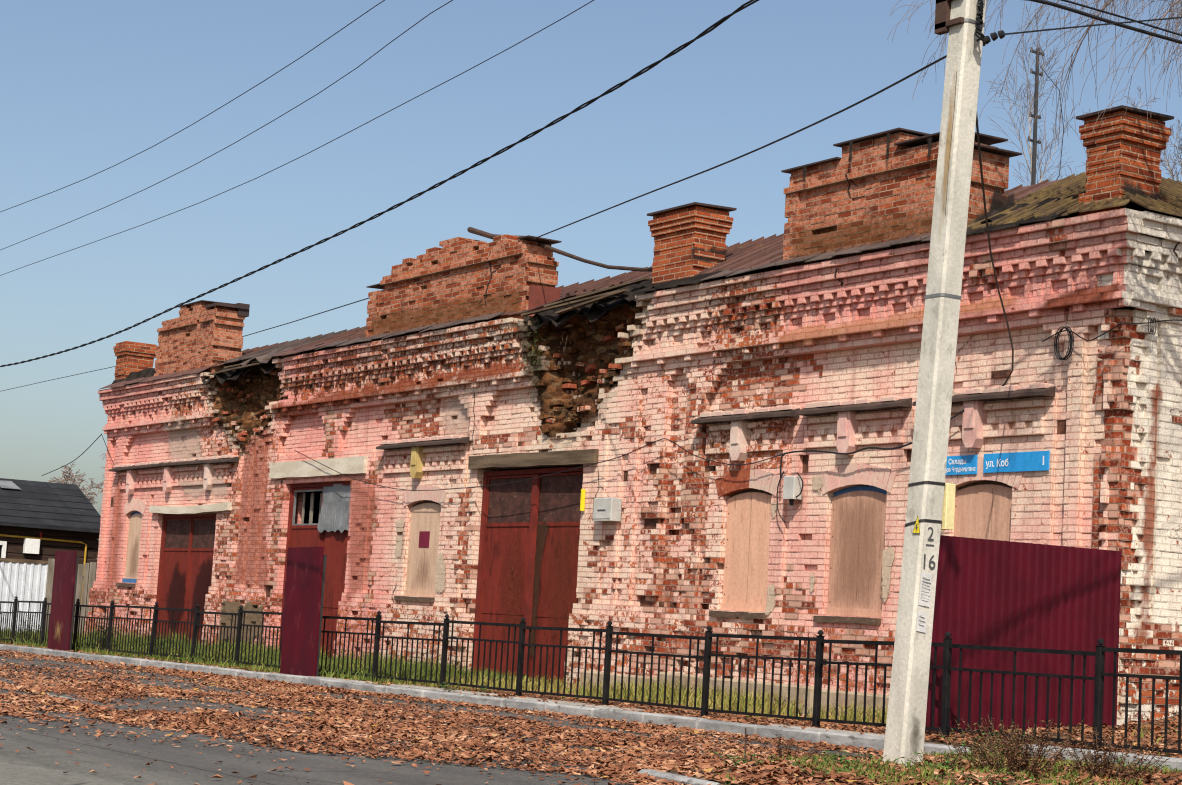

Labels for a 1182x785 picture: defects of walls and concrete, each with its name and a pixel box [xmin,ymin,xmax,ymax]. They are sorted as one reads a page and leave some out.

spalling [1104,308,1145,340]
spalling [1096,358,1140,411]
peeling [199,439,232,465]
peeling [601,286,895,678]
peeling [204,478,303,609]
peeling [582,529,630,609]
spalling [1092,445,1182,690]